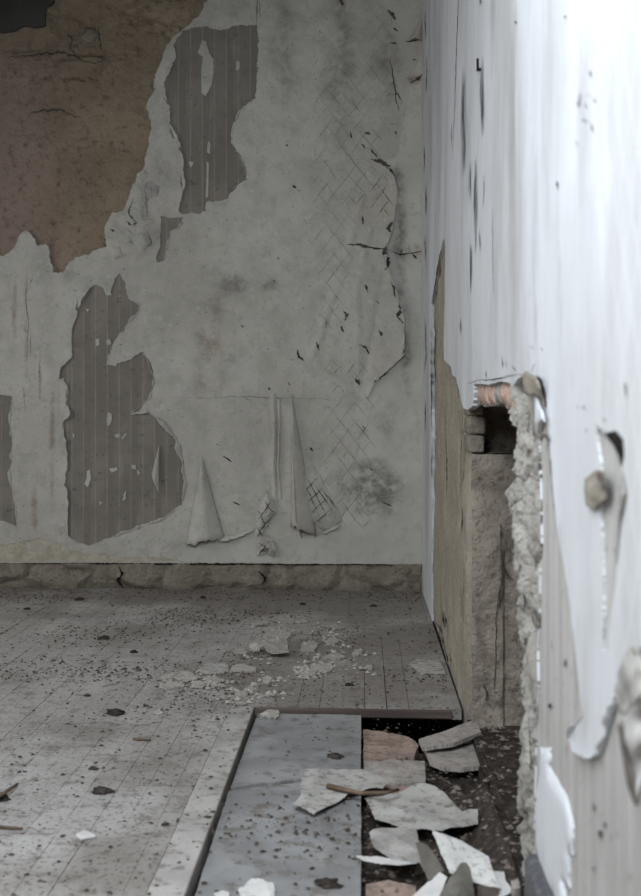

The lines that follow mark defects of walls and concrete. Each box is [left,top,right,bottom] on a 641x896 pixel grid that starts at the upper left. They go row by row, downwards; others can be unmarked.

spalling [0,0,259,273]
peeling [0,55,422,592]
peeling [433,243,641,896]